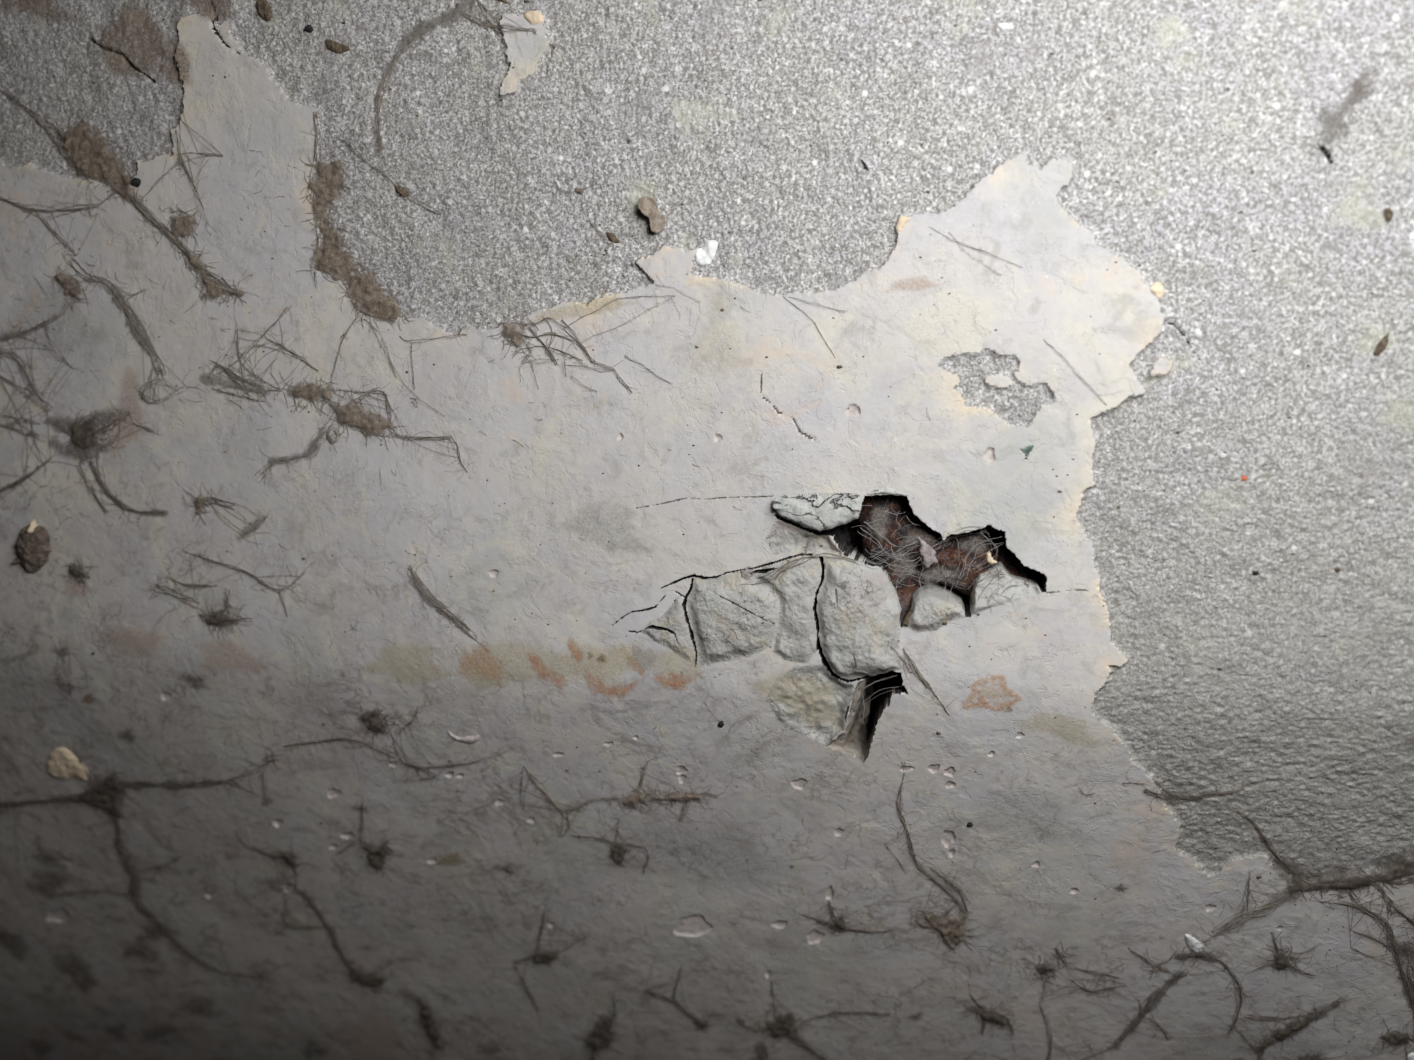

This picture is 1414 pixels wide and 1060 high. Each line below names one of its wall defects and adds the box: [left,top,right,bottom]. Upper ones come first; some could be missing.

flaking render [997,23,1014,31]
peeling [638,196,666,233]
flaking render [695,240,718,266]
flaking render [938,348,1056,428]
spalling [845,404,861,417]
spalling [766,487,1047,633]
crack [612,553,869,723]
corrosion [461,641,699,695]
corrosion [964,675,1020,711]
spalling [765,663,908,763]
flaking render [47,747,89,781]
spalling [900,764,956,789]